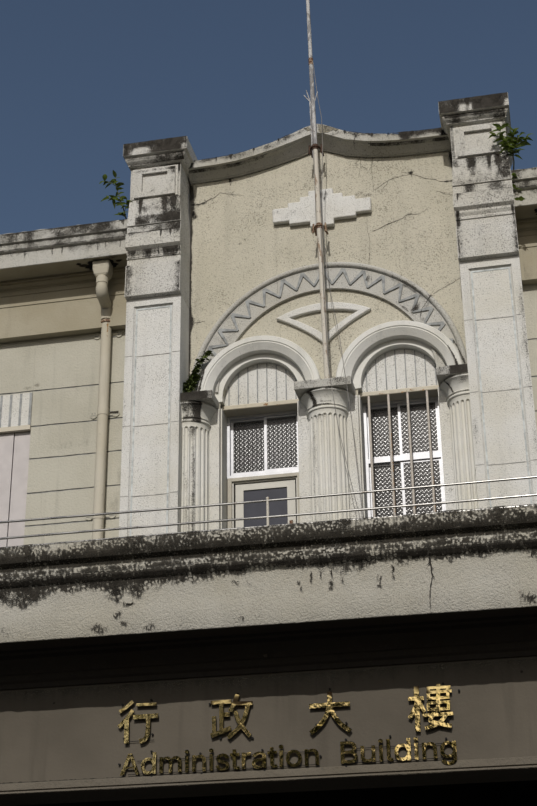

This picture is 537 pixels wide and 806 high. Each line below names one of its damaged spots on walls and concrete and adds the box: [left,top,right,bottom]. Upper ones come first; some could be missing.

water stain [123,128,306,180]
crack [330,131,445,193]
water stain [344,92,537,251]
water stain [0,190,181,260]
water stain [125,245,180,296]
water stain [189,184,206,376]
water stain [436,340,468,395]
water stain [0,370,537,626]
crack [425,544,435,606]